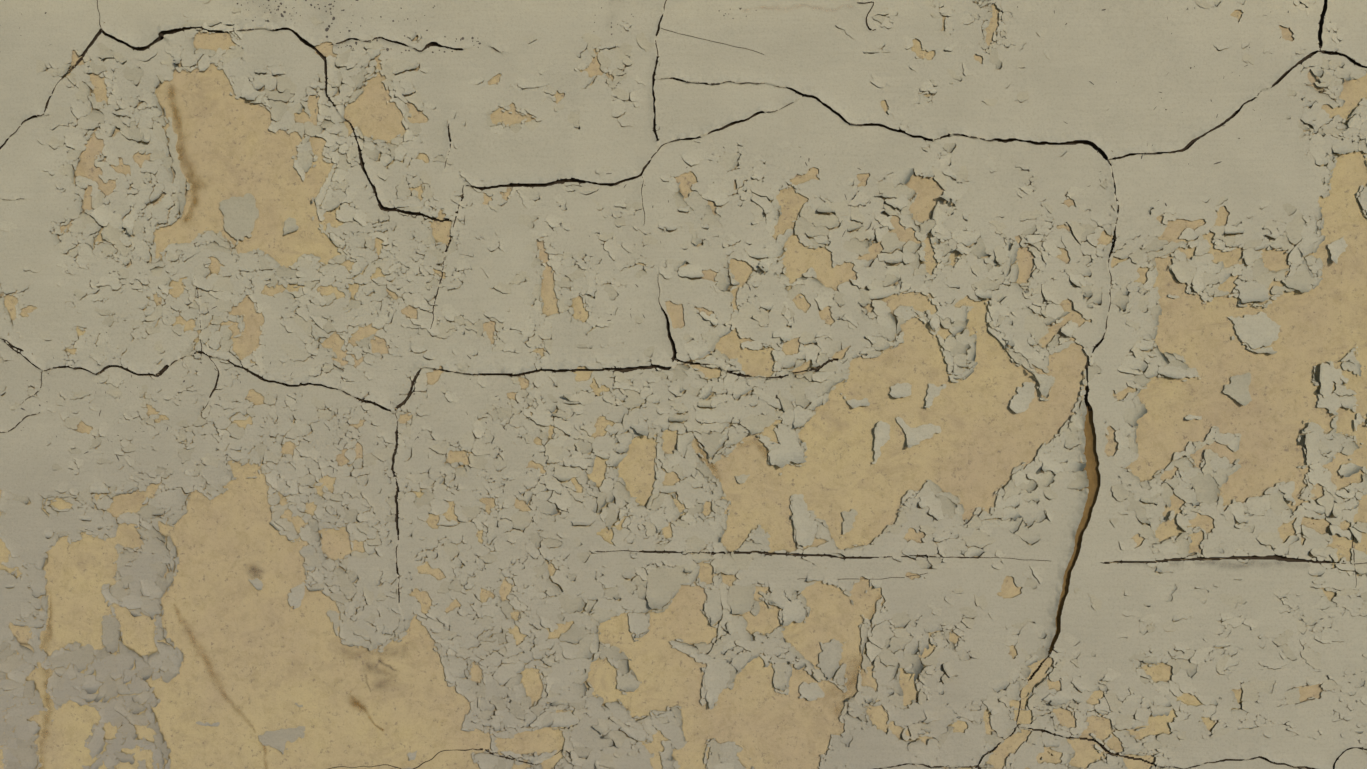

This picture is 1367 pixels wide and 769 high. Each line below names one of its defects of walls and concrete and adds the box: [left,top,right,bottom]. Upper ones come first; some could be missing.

peeling [1230,0,1245,22]
peeling [1279,25,1295,41]
crack [0,0,510,149]
peeling [555,177,658,278]
peeling [0,264,49,344]
peeling [662,297,685,329]
crack [328,0,1367,769]
peeling [385,402,434,461]
crack [0,279,838,603]
peeling [989,550,1045,599]
peeling [1109,553,1173,574]
peeling [1234,548,1249,564]